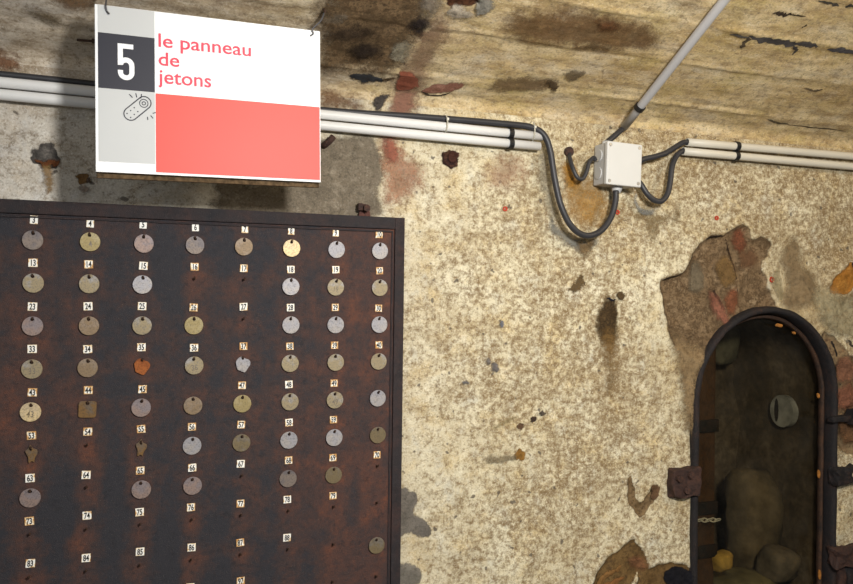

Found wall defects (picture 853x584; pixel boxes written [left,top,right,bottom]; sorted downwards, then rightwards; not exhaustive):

crack [819,0,853,8]
damp [315,0,430,83]
crack [730,11,853,55]
damp [373,94,390,111]
peeling [394,71,464,112]
spalling [830,262,853,295]
spalling [660,224,816,431]
spalling [822,332,853,454]
peeling [627,476,660,517]
spalling [593,539,694,584]